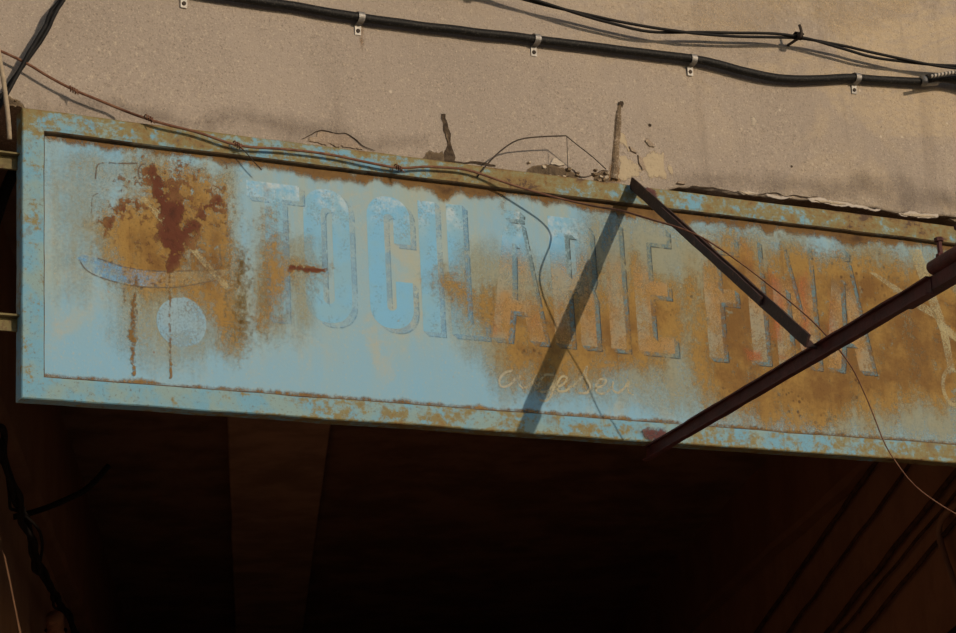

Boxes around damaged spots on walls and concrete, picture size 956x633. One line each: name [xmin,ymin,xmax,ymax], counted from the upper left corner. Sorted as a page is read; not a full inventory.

peeling [423,151,444,161]
peeling [527,132,686,185]
peeling [736,190,792,199]
peeling [808,197,880,211]
peeling [897,211,956,224]